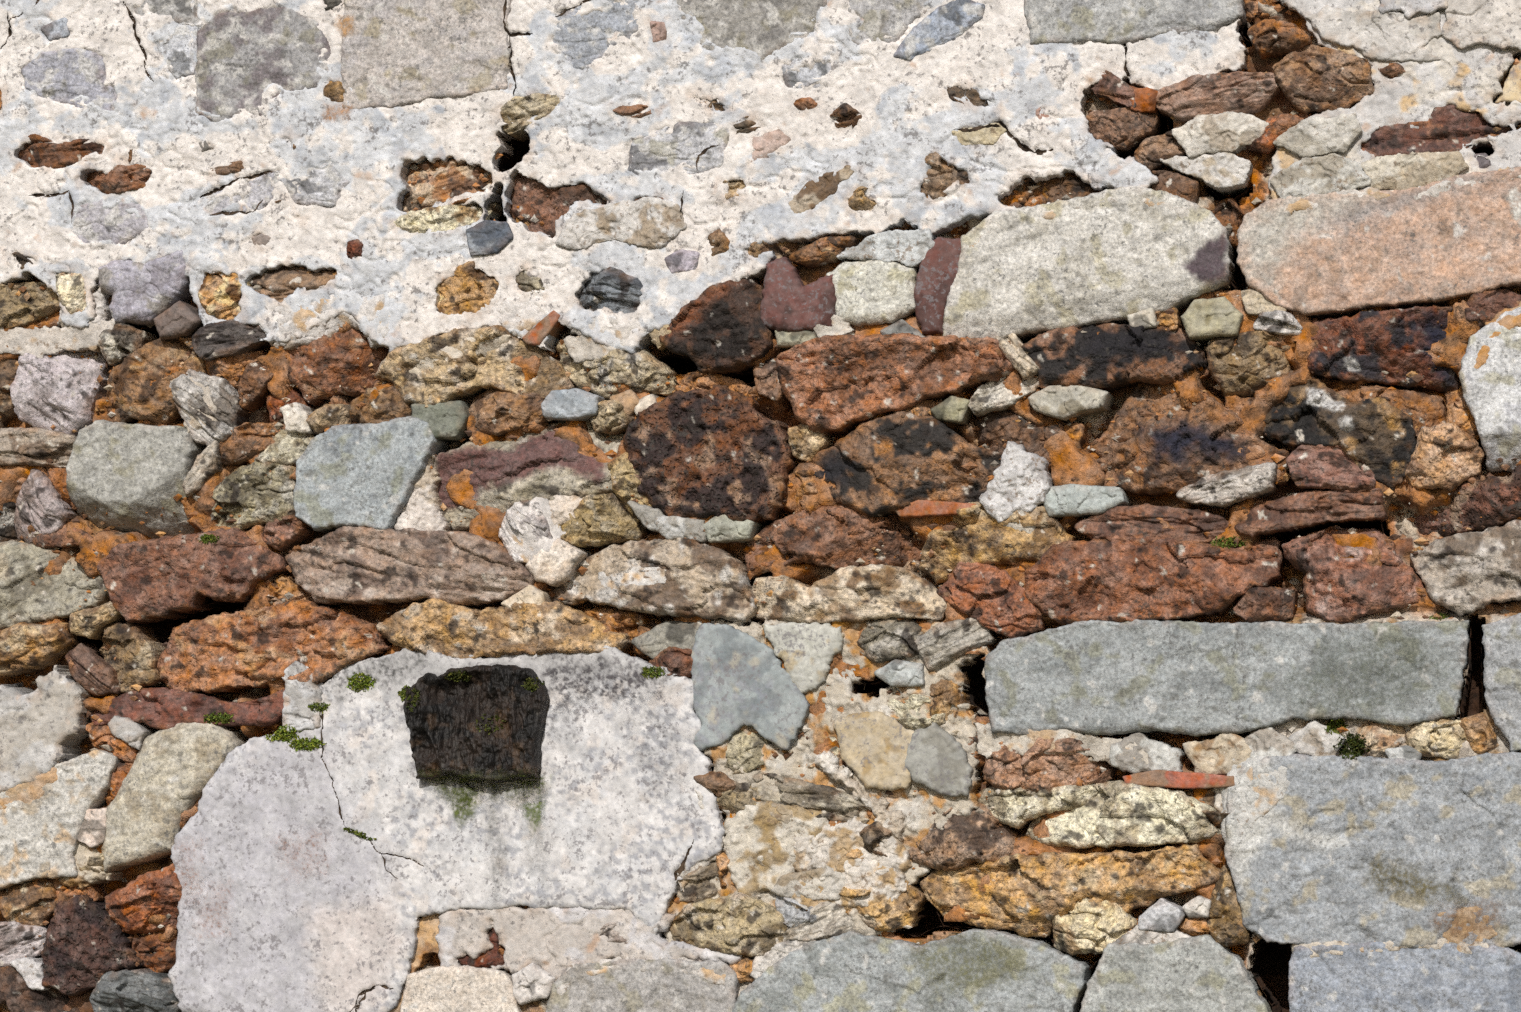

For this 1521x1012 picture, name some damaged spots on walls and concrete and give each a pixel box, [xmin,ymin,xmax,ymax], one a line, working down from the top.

crack [503,0,590,95]
peeling [1305,0,1521,103]
spalling [499,134,530,172]
spalling [346,239,363,259]
spalling [466,202,514,256]
spalling [664,228,730,274]
spalling [1231,249,1303,336]
spalling [280,402,317,435]
spalling [930,396,973,425]
spalling [136,601,248,643]
crack [319,710,423,879]
leakage [431,775,544,824]